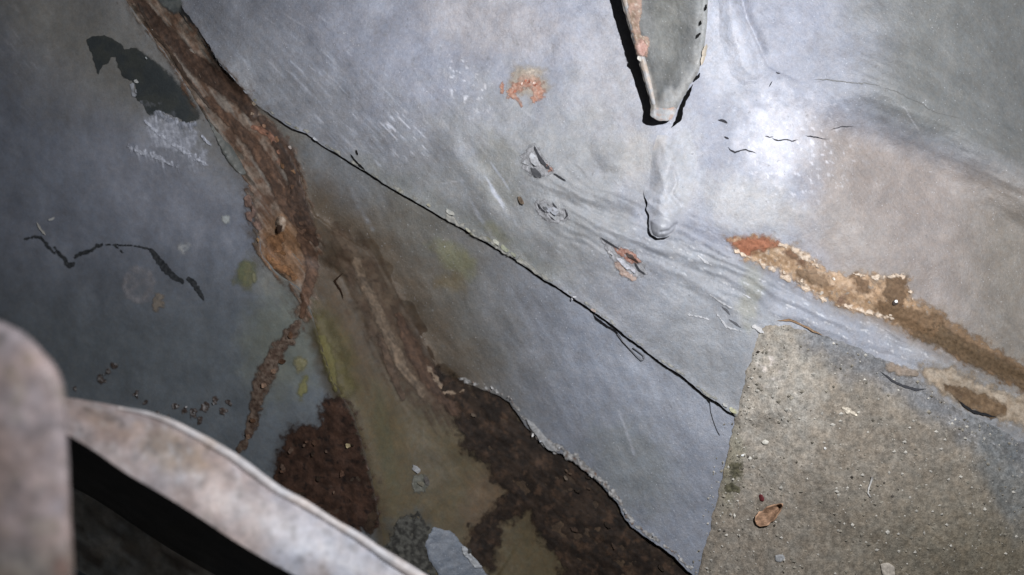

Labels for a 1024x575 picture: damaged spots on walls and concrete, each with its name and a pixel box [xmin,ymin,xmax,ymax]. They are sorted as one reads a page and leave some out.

peeling [87,35,246,175]
spalling [520,144,566,181]
crack [719,119,854,153]
crack [24,235,204,300]
rust [126,0,691,575]
crack [261,109,736,417]
spalling [601,238,648,280]
crack [883,373,926,391]
peeling [458,377,698,575]